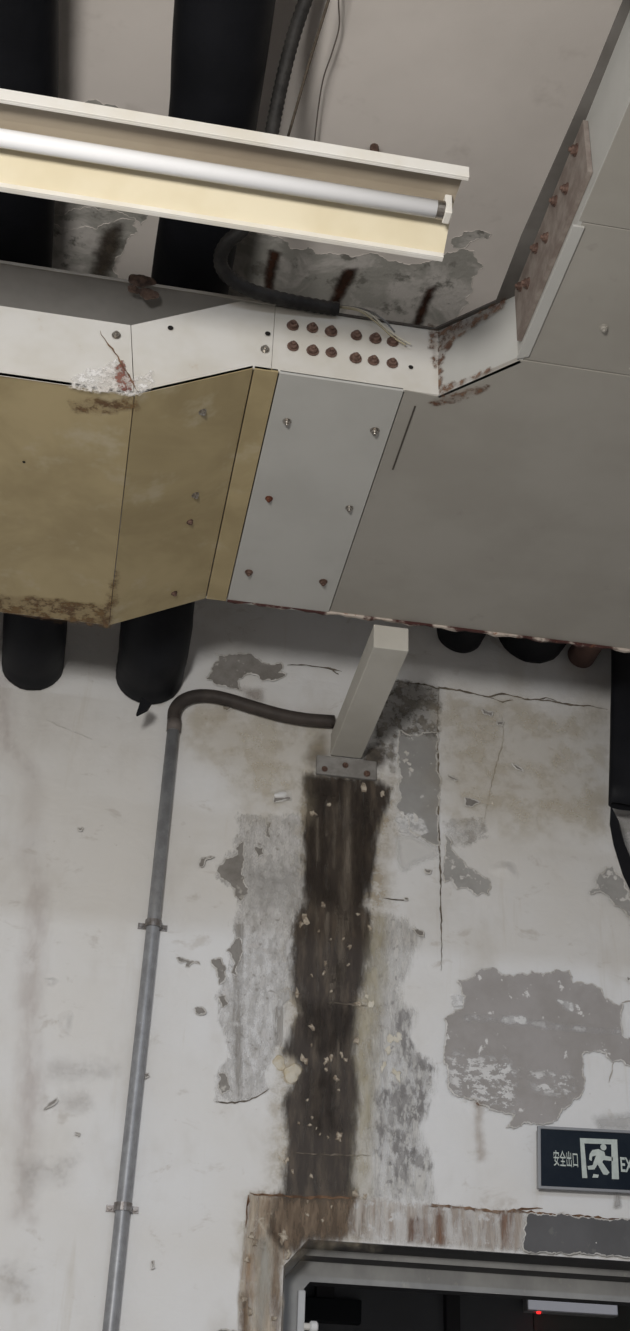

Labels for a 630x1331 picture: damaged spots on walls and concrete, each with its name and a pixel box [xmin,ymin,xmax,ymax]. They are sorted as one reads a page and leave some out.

peeling [228,230,492,327]
peeling [177,795,304,1104]
peeling [206,652,287,691]
leakage [253,775,392,1260]
crack [435,806,443,969]
peeling [395,730,492,896]
peeling [359,915,630,1201]
crack [395,681,608,819]
peeling [589,866,630,919]